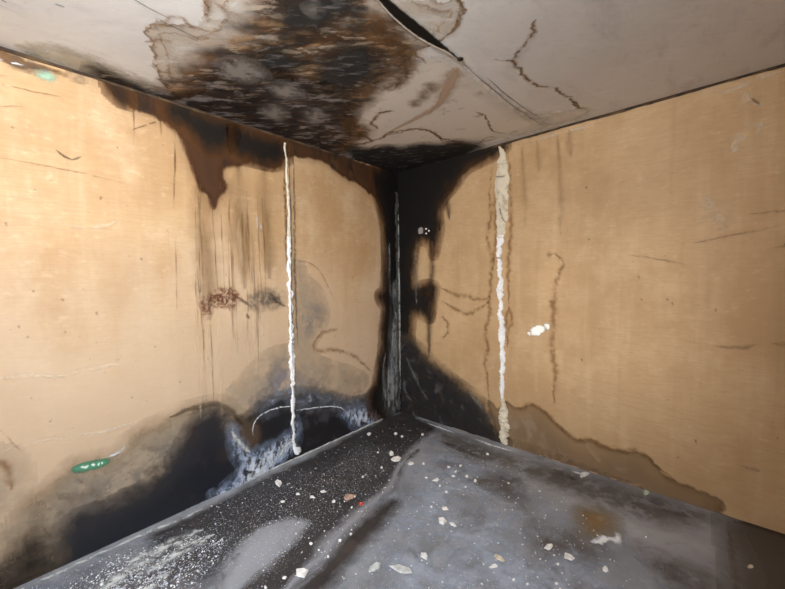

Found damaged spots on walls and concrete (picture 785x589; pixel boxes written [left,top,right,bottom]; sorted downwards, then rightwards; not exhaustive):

corrosion [201,287,248,312]
crack [284,155,297,325]
water stain [0,0,586,589]
water stain [476,401,727,520]